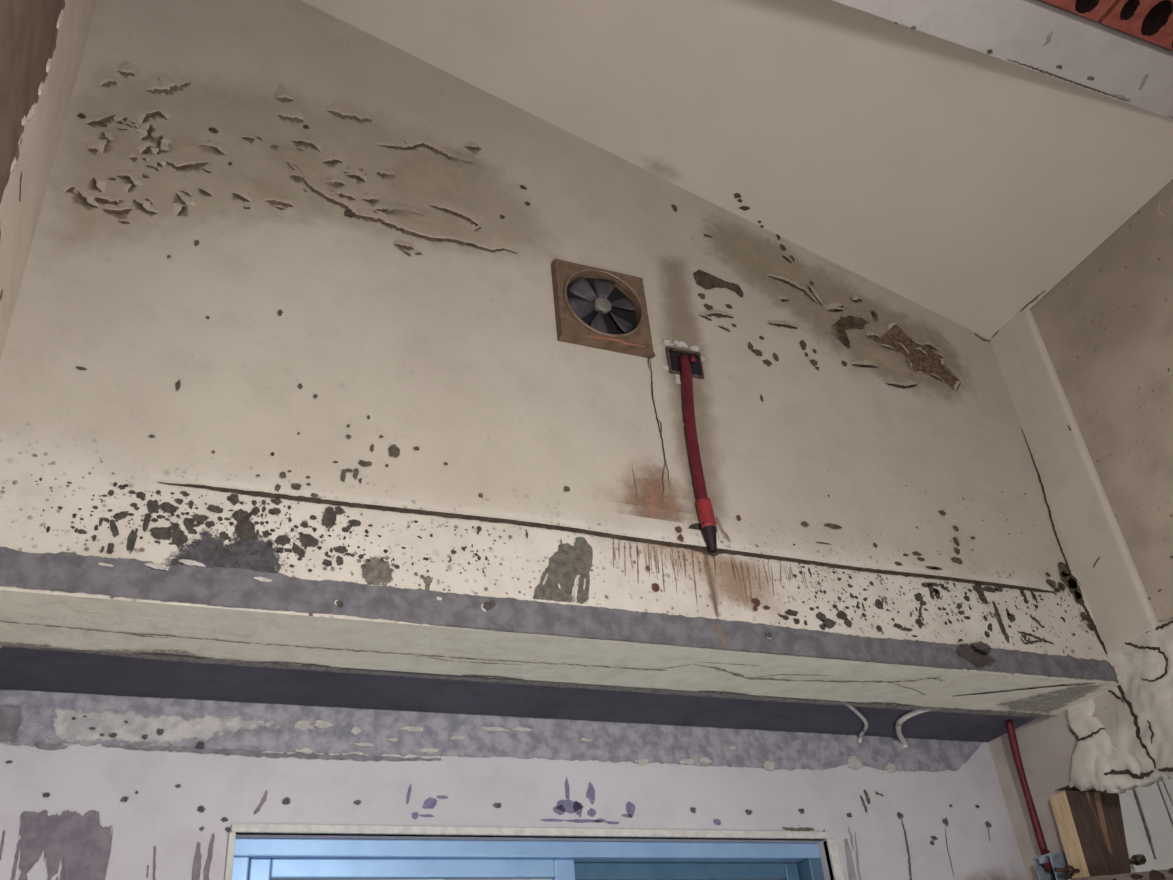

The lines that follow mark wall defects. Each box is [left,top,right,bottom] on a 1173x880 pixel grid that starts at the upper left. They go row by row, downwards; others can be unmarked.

peeling [62,60,232,224]
peeling [232,84,518,256]
flaking render [693,269,743,332]
peeling [703,228,961,391]
leakage [40,470,434,574]
leakage [332,435,420,483]
leakage [446,526,492,574]
crack [156,358,1173,779]
corrosion [613,467,808,617]
leakage [765,510,1094,645]
leakage [0,810,113,880]
leakage [146,846,156,880]